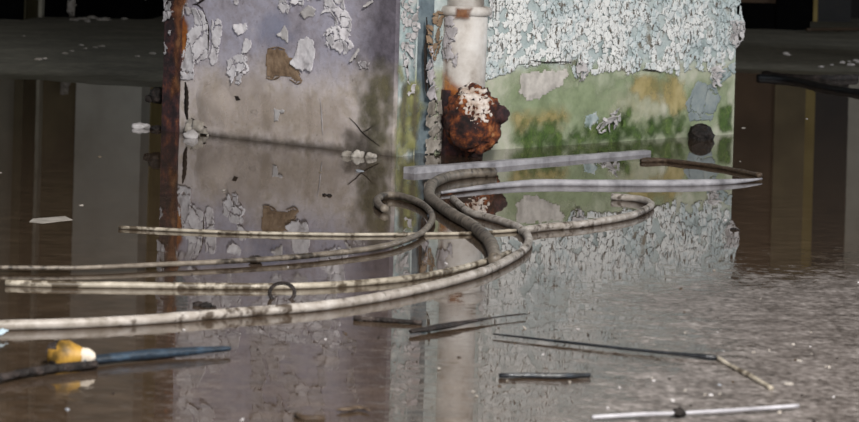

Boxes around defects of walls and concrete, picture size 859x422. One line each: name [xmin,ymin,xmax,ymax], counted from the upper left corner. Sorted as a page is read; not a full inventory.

peeling [67,0,77,17]
rust [173,0,188,64]
peeling [162,0,252,85]
peeling [266,0,370,84]
peeling [486,0,746,122]
water stain [618,76,686,116]